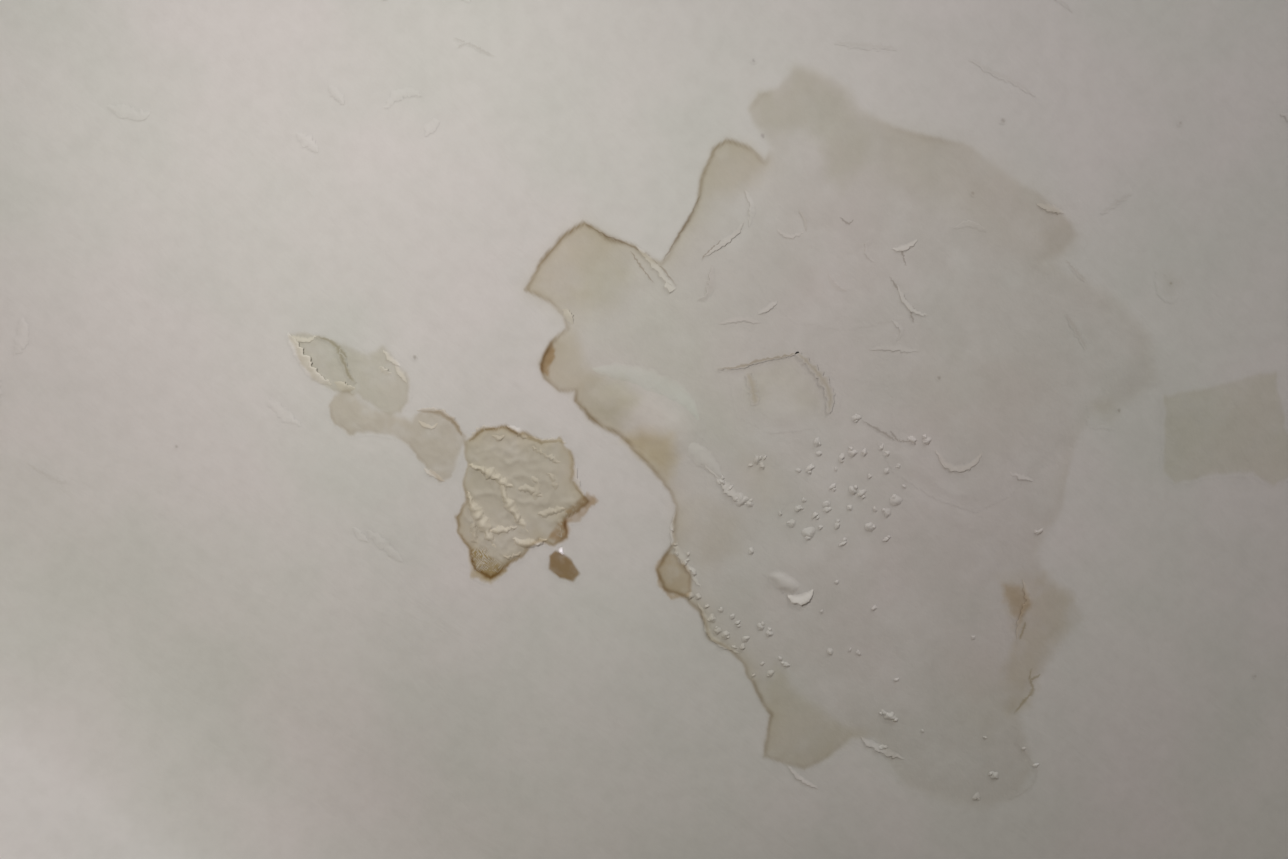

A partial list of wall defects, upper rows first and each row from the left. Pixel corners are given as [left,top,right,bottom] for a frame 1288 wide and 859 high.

water stain [693,55,1093,331]
peeling [285,329,586,578]
water stain [508,203,842,489]
water stain [884,318,1131,476]
water stain [1159,368,1288,490]
water stain [757,655,874,773]
water stain [930,563,1080,763]